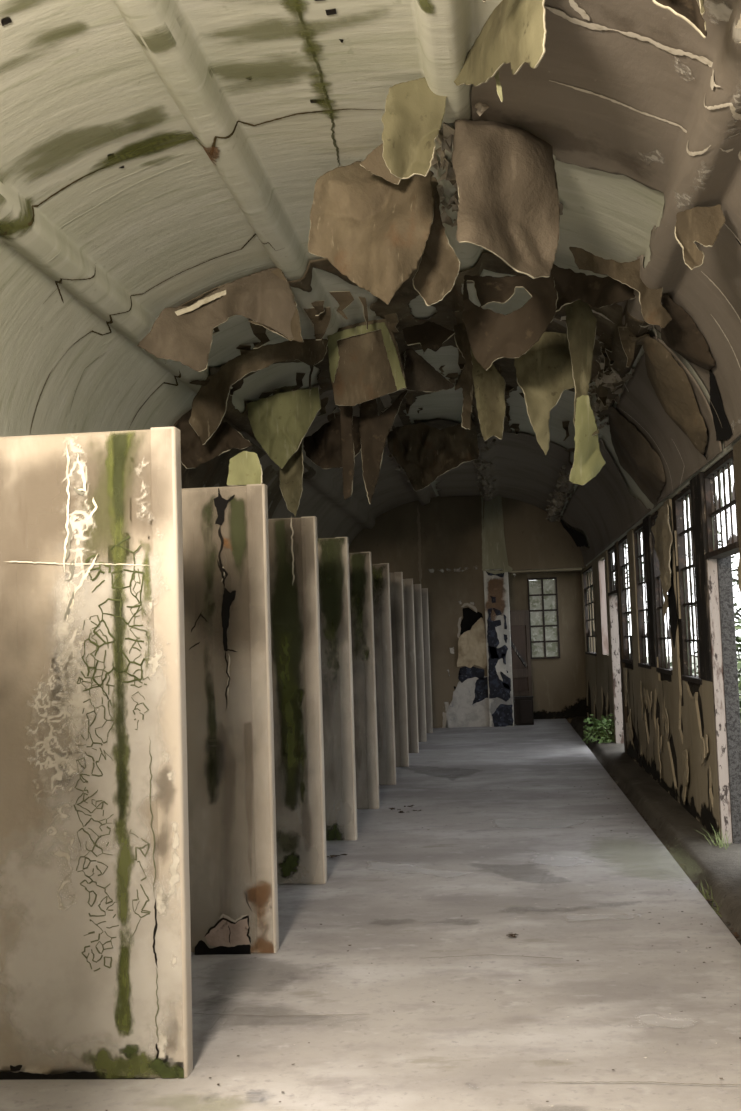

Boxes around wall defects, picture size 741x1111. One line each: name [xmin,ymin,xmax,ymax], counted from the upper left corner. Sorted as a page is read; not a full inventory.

damp [0,198,33,239]
damp [24,108,202,178]
crack [0,13,374,304]
peeling [454,0,547,103]
crack [545,0,741,120]
peeling [652,0,707,39]
peeling [137,77,672,584]
damp [1,432,183,1060]
crack [74,536,159,1059]
crack [214,488,237,708]
damp [271,520,305,810]
peeling [442,570,516,728]